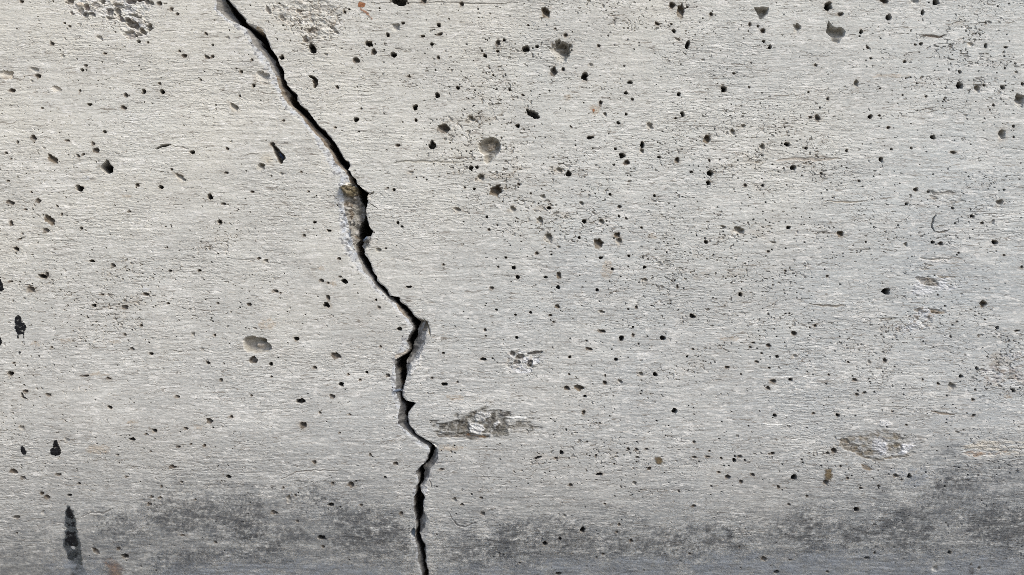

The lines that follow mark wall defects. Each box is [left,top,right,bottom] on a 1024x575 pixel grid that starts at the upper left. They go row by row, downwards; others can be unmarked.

crack [213,0,477,575]